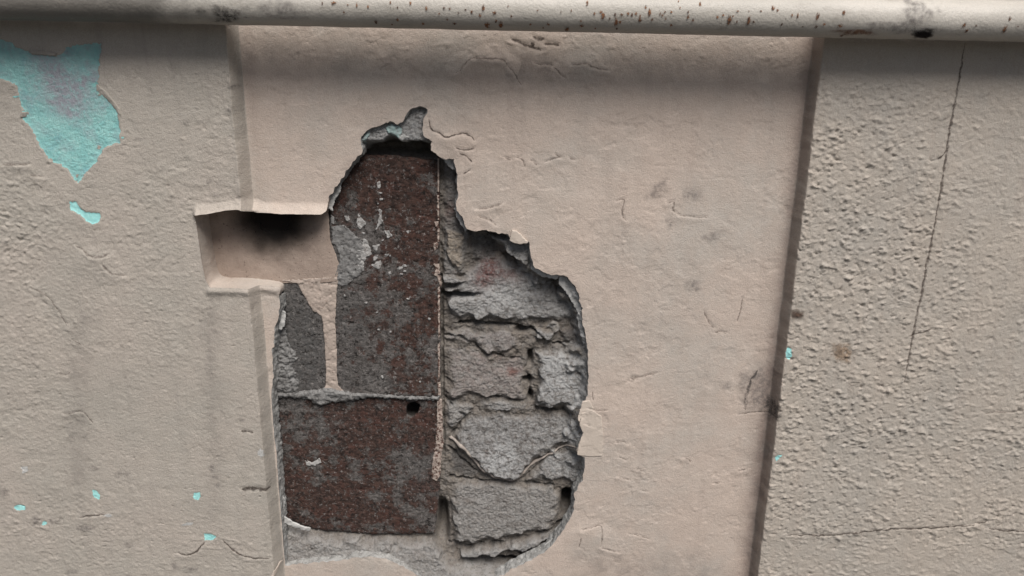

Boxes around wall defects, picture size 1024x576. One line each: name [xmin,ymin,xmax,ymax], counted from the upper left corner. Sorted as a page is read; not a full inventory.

rust [565,0,701,31]
peeling [0,39,127,183]
peeling [69,201,101,224]
spalling [328,106,432,275]
crack [905,50,964,377]
spalling [257,157,603,576]
crack [788,522,1024,536]